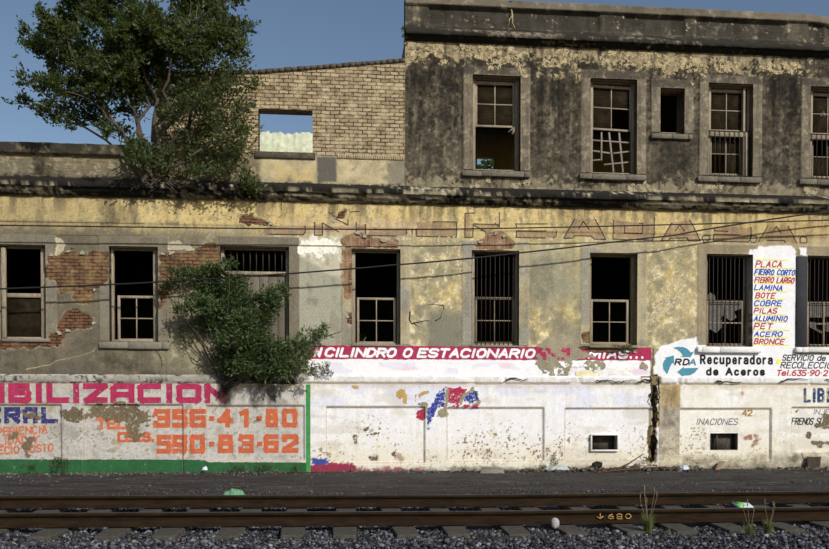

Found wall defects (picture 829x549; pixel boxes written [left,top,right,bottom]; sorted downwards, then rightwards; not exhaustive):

spalling [476,232,514,250]
spalling [0,237,110,350]
spalling [158,240,220,310]
spalling [297,231,398,300]
peeling [535,332,637,378]
peeling [8,431,35,458]
peeling [60,401,154,442]
peeling [396,386,481,430]
crack [596,348,660,462]
peeling [806,413,829,448]